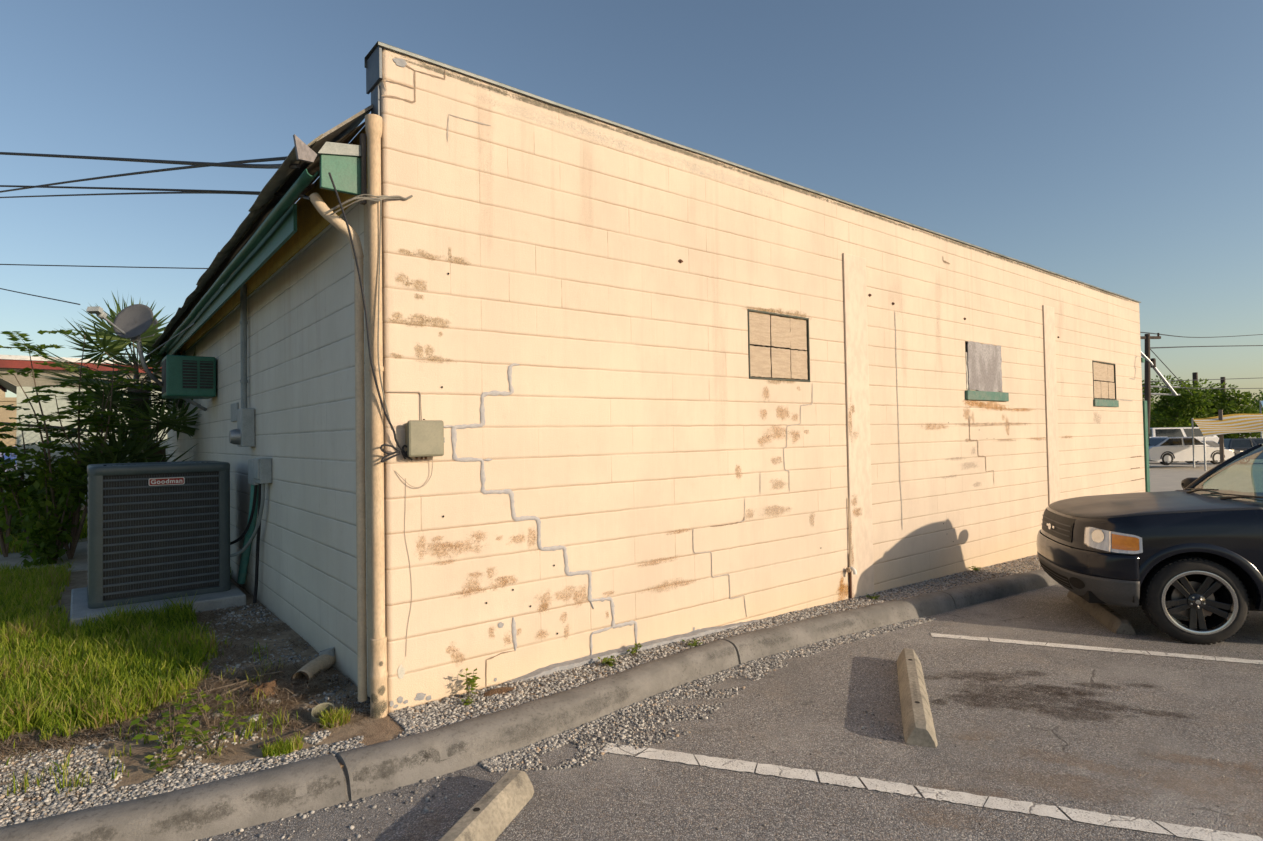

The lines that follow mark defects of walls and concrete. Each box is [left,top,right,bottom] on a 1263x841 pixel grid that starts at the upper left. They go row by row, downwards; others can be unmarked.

crack [486,617,517,686]
crack [444,363,638,655]